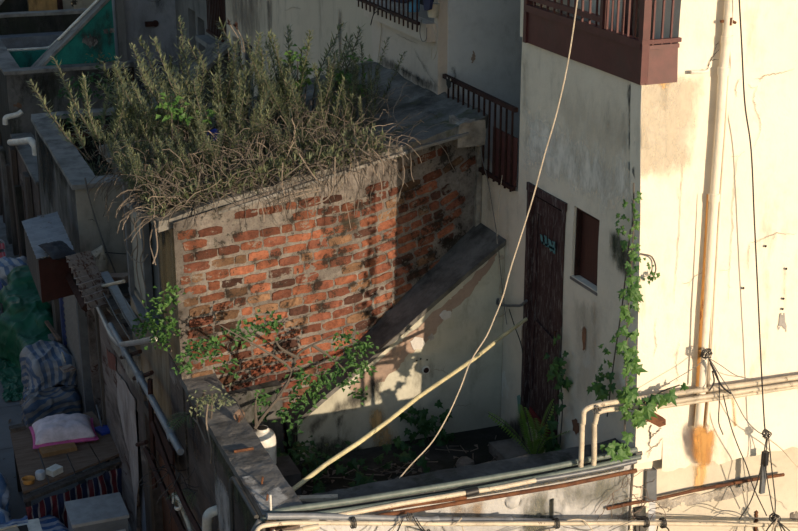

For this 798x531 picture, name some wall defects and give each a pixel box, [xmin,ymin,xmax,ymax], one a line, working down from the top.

damp [528,82,692,227]
crack [724,71,794,301]
peeling [350,253,497,392]
spalling [778,297,787,332]